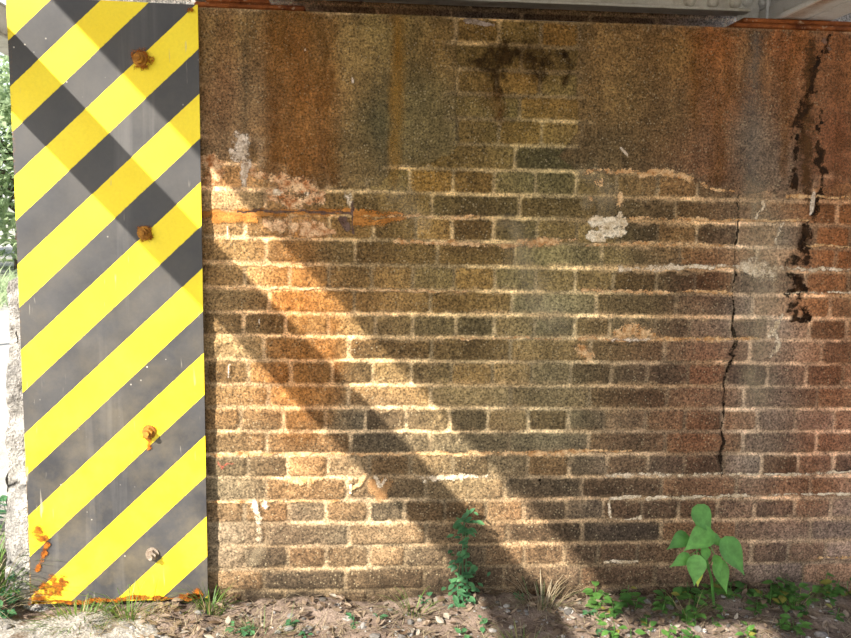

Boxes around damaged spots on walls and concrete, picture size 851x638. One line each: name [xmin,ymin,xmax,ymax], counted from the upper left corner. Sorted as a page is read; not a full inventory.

corrosion [202,202,406,234]
damp [469,39,552,116]
peeling [558,22,851,215]
crack [783,34,831,323]
crack [718,188,740,476]